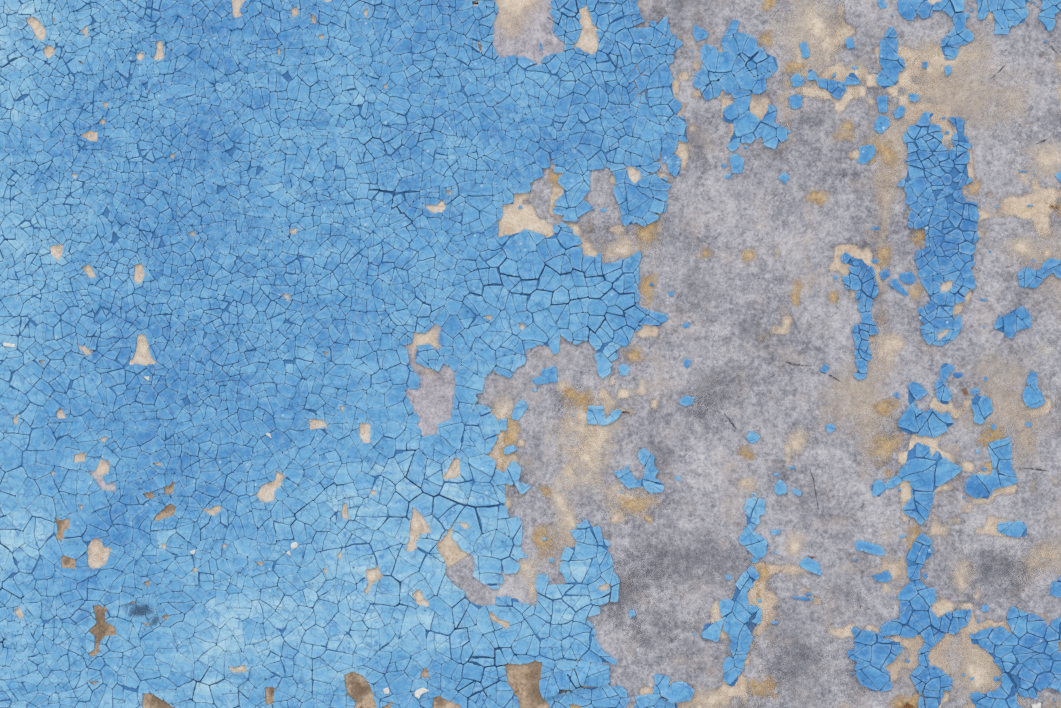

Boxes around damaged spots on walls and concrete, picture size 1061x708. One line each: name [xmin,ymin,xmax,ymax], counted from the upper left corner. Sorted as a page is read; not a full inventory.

crack [919,0,1061,56]
crack [700,35,788,149]
crack [784,256,876,381]
crack [871,113,991,517]
peeling [872,458,936,525]
peeling [916,408,954,438]
peeling [976,437,1017,495]
crack [701,571,759,687]
peeling [847,606,918,675]
crack [852,542,1061,708]
peeling [908,587,1023,708]
peeling [1001,616,1061,708]